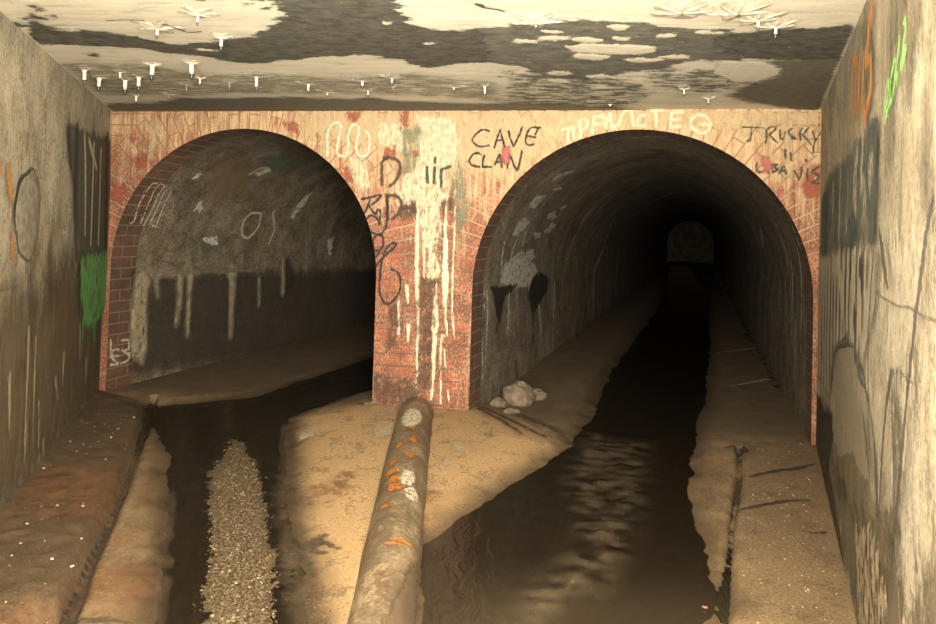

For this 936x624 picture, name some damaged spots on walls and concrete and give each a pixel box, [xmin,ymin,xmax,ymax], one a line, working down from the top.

peeling [13,0,855,108]
leakage [107,58,841,405]